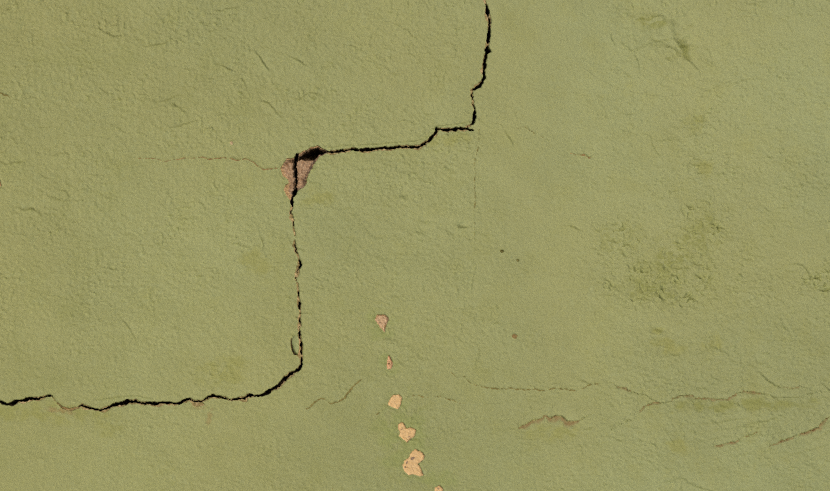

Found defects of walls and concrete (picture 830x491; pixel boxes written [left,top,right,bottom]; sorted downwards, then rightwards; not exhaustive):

crack [323,0,491,236]
flaking render [281,146,327,200]
crack [0,153,303,413]
crack [306,380,361,409]
peeling [388,394,402,409]
peeling [398,422,425,476]